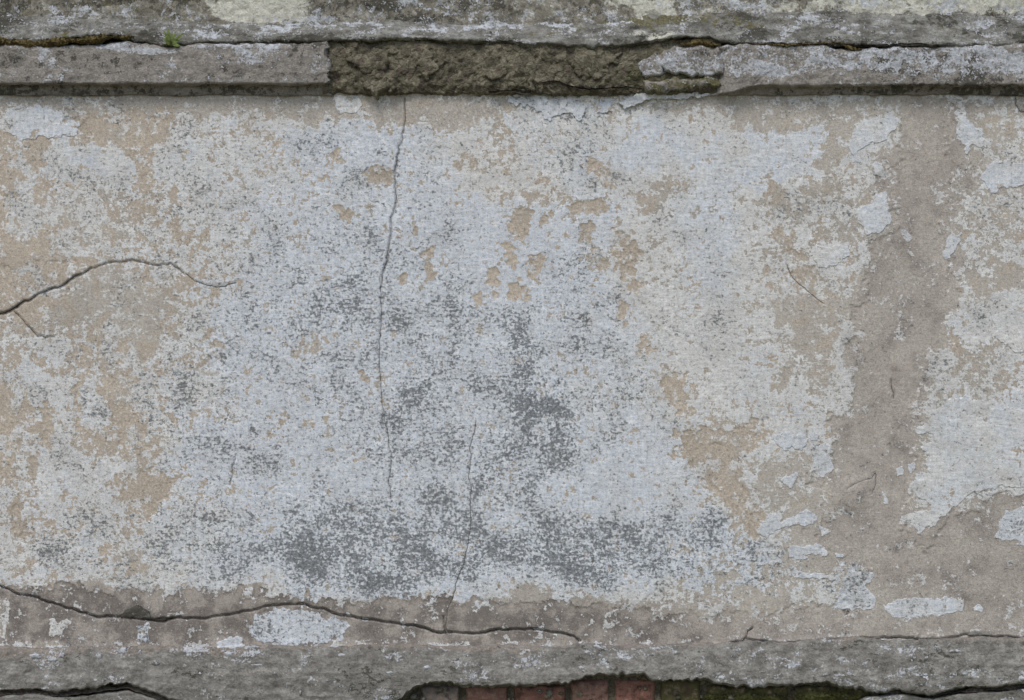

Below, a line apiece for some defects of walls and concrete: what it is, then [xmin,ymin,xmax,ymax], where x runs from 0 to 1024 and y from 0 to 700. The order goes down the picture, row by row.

spalling [320,38,725,132]
crack [0,259,236,337]
peeling [0,94,1024,654]
crack [1,422,577,639]
spalling [403,673,875,700]